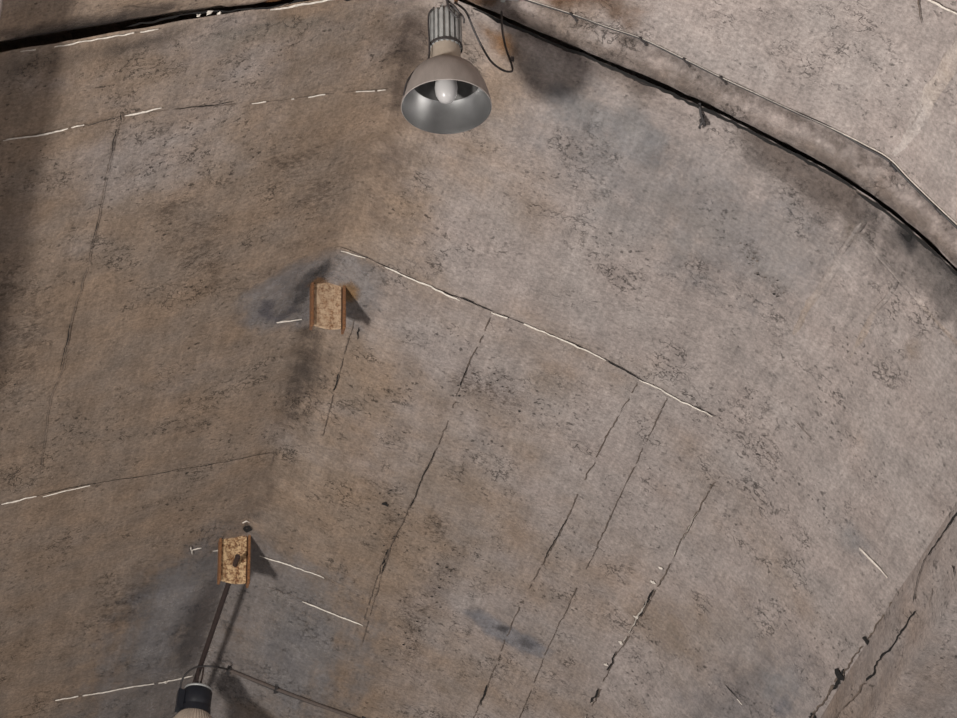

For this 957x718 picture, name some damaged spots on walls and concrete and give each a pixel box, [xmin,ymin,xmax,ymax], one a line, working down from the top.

crack [63,0,304,28]
damp [507,11,554,34]
damp [569,37,716,104]
damp [248,256,374,325]
damp [799,143,957,314]
crack [260,247,720,718]
damp [98,547,332,718]
crack [809,512,957,718]